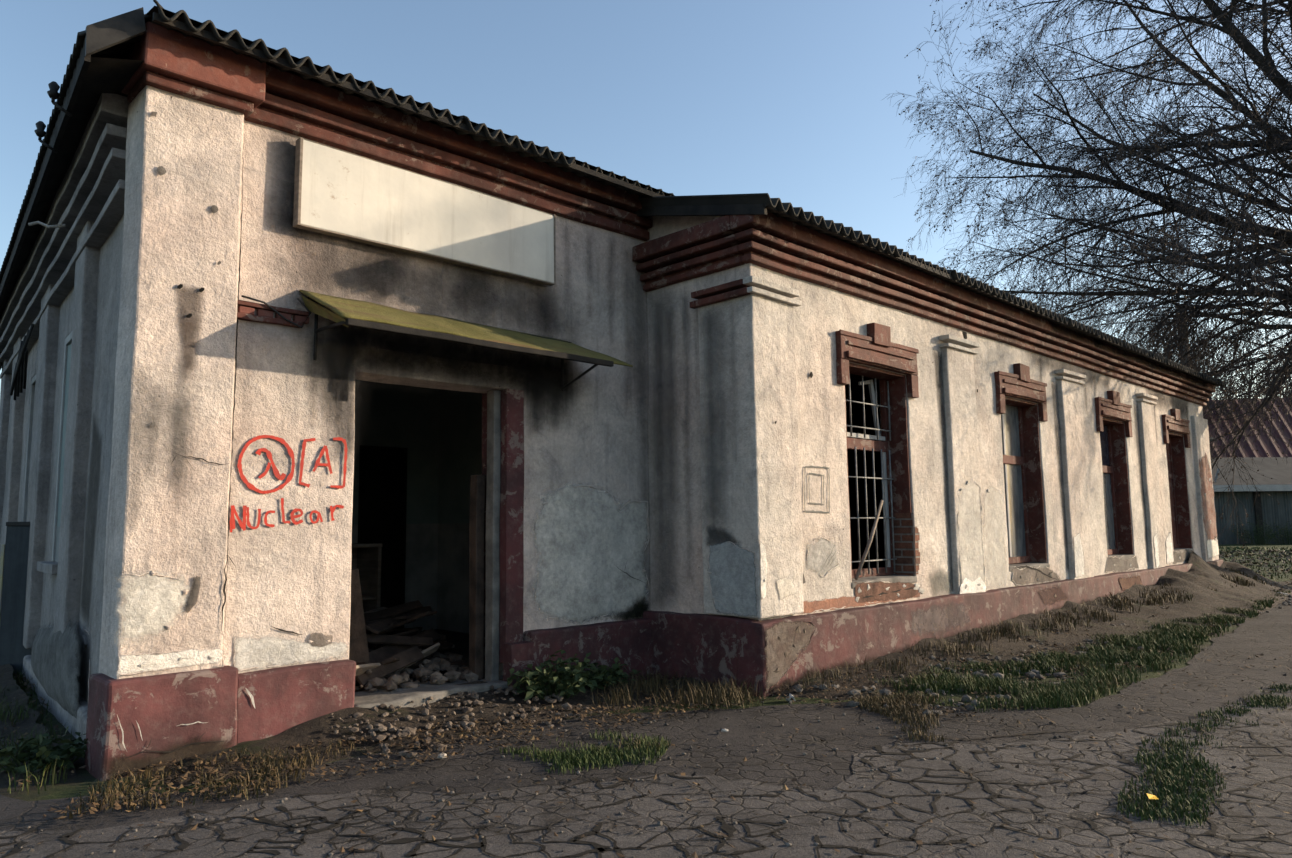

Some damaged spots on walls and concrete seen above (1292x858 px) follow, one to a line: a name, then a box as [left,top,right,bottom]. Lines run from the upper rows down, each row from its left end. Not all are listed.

water stain [180,289,201,364]
crack [171,136,245,634]
flaking render [1154,453,1219,568]
flaking render [117,571,347,676]
flaking render [707,513,925,695]
spalling [1105,556,1143,591]